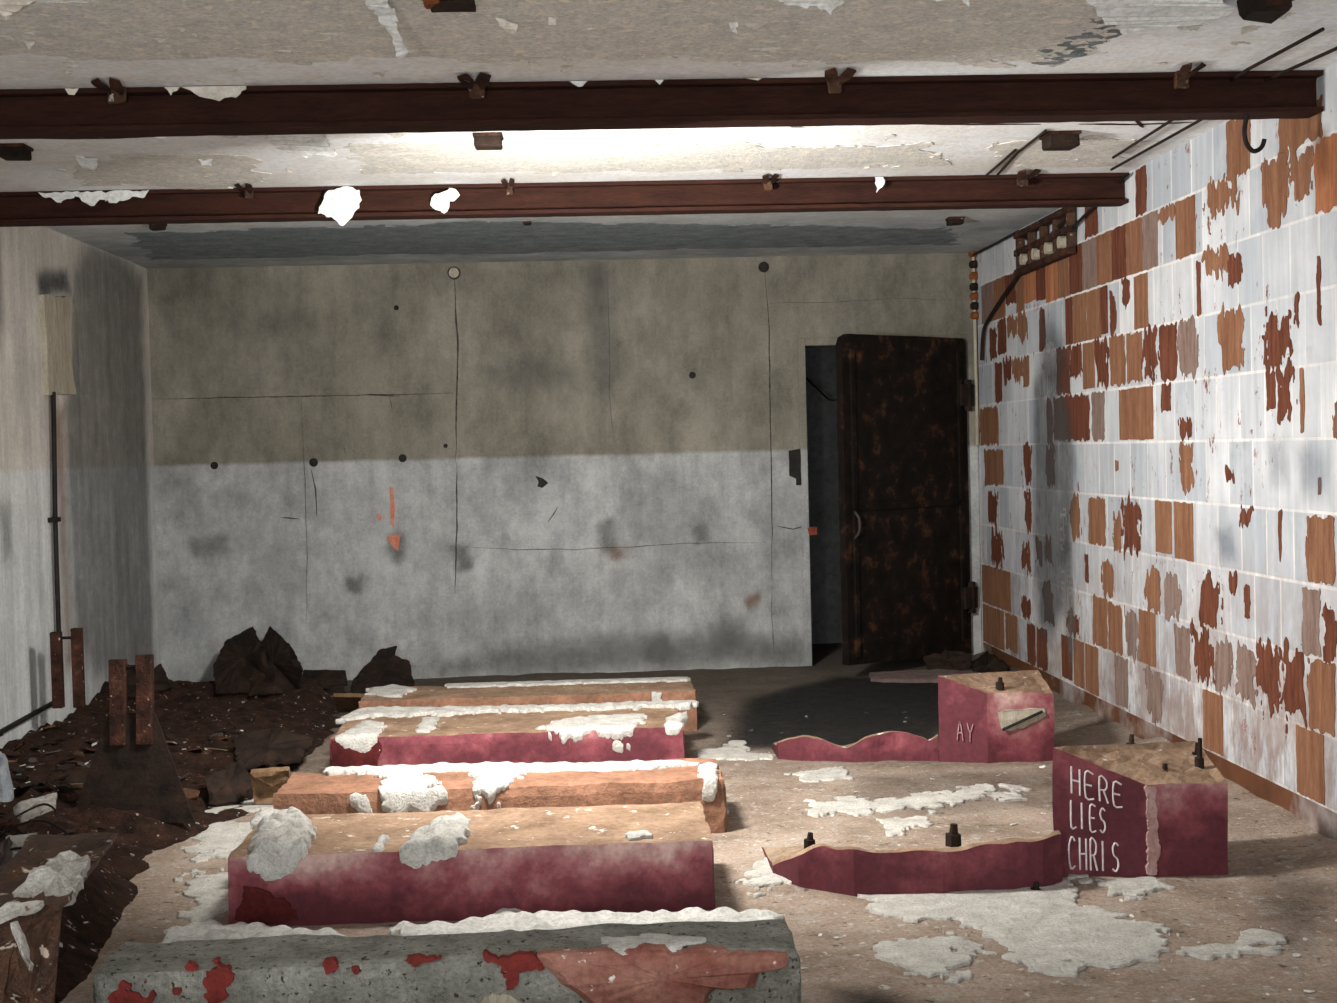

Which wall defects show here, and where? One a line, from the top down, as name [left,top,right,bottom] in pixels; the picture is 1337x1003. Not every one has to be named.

spalling [0,0,1238,101]
peeling [980,94,1337,805]
spalling [481,992,522,1003]